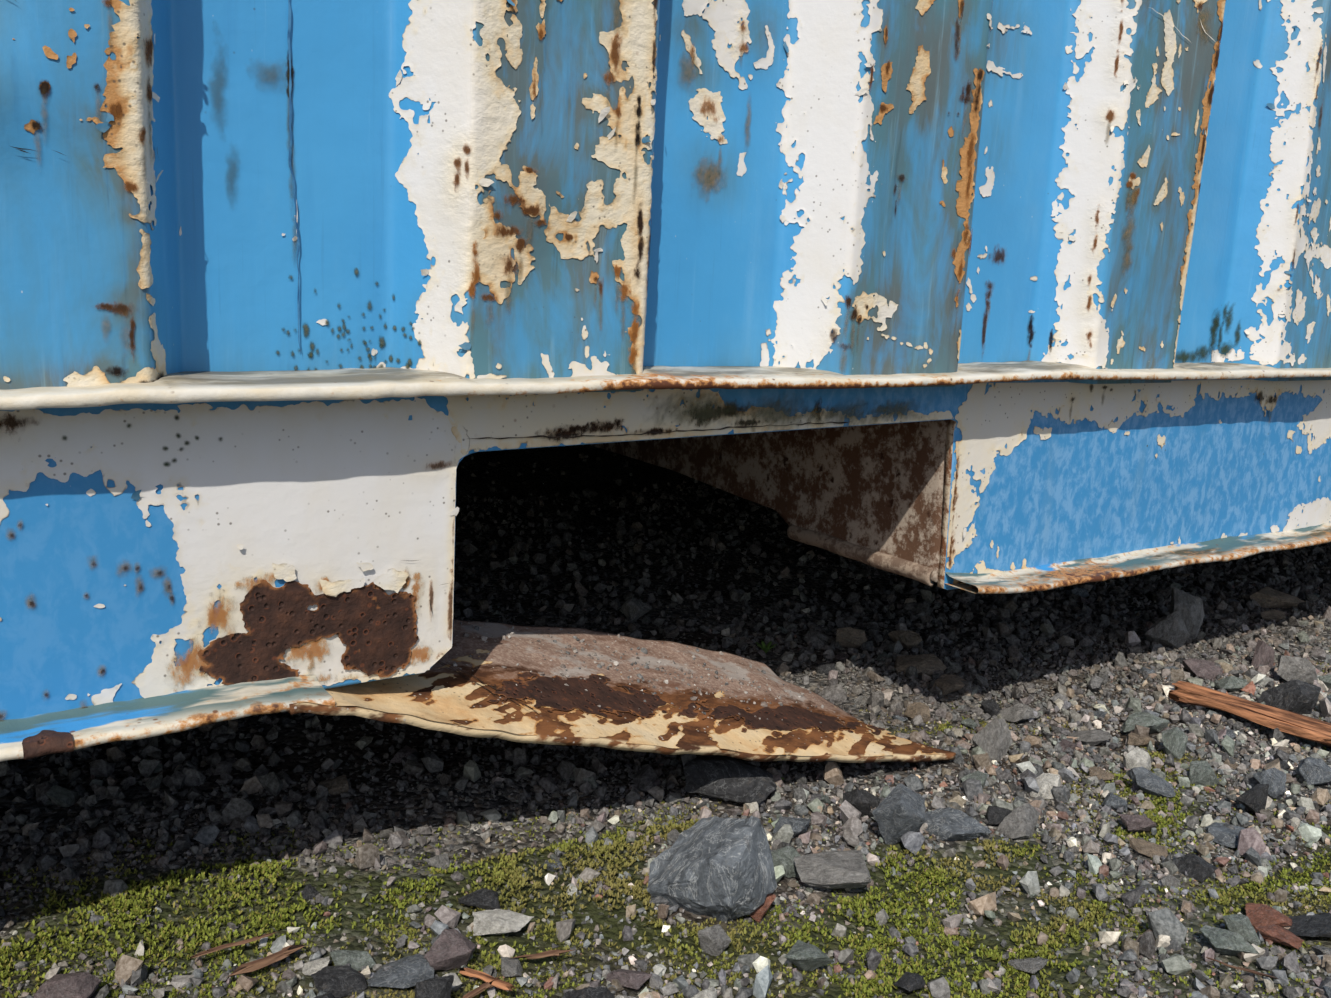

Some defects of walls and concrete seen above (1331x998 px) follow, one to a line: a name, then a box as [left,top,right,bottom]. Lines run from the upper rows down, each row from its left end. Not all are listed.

corrosion [145,40,153,65]
corrosion [1214,23,1223,69]
corrosion [39,80,50,97]
corrosion [109,102,122,120]
corrosion [948,69,983,115]
corrosion [966,134,975,198]
corrosion [952,224,972,302]
corrosion [1028,315,1053,349]
peeling [0,0,1331,756]
corrosion [168,562,453,686]
corrosion [471,672,885,735]